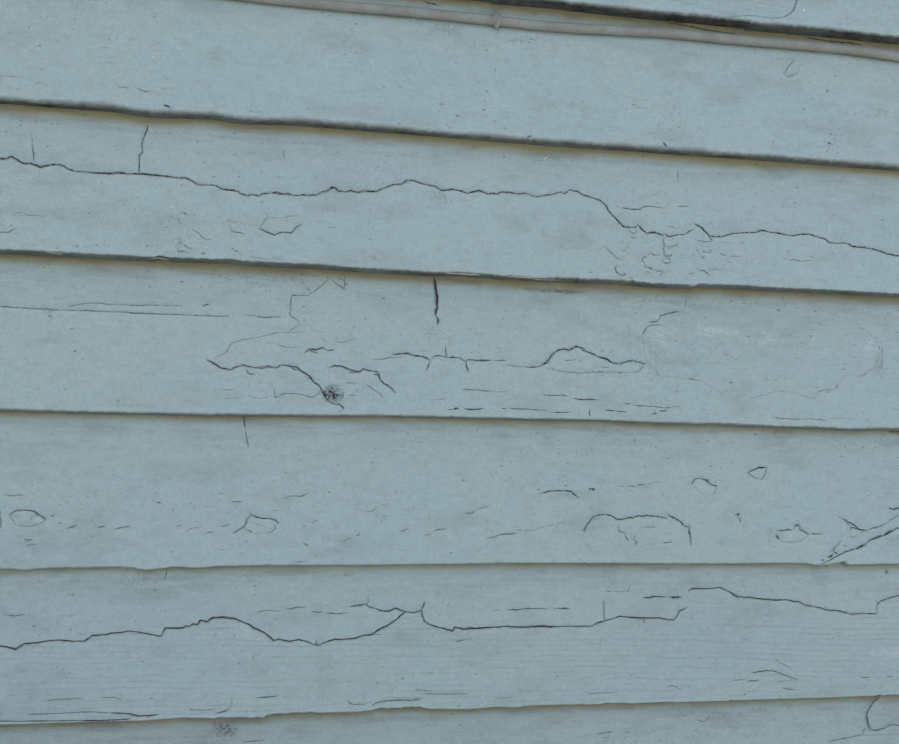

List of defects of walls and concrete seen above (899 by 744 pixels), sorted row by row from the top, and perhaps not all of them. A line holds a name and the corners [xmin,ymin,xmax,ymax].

crack [210,277,679,414]
crack [828,508,898,561]
peeling [0,588,899,719]